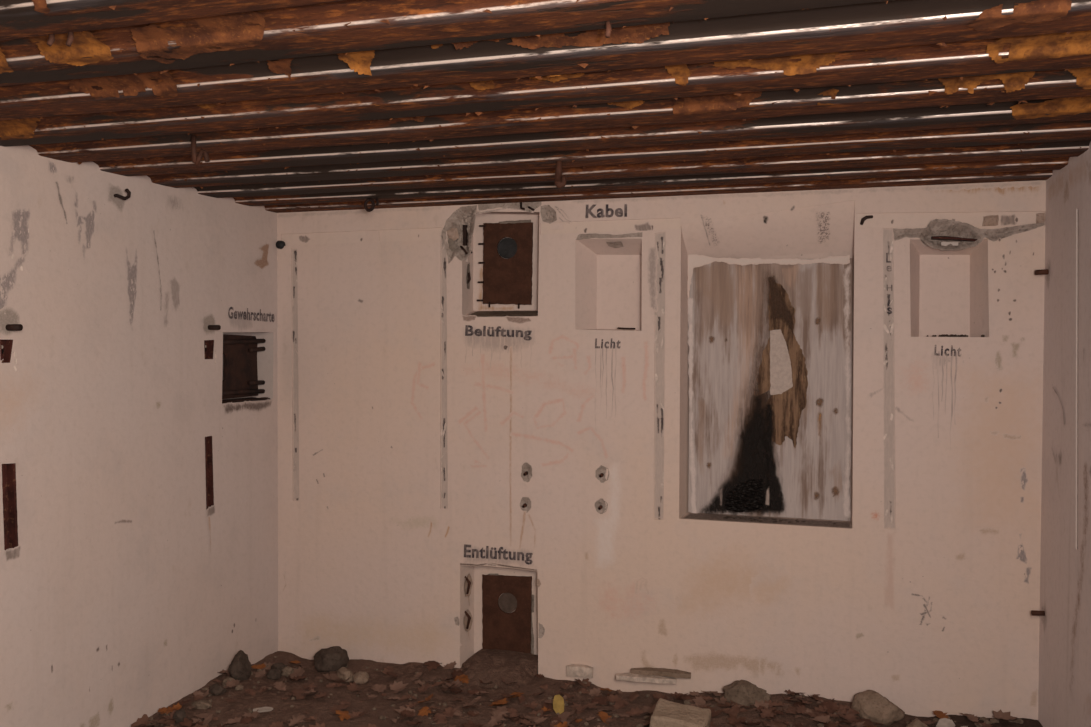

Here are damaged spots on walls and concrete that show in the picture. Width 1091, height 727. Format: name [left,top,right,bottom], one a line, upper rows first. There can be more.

rust [29,11,265,98]
rust [337,50,375,76]
rust [938,0,1091,120]
peeling [0,208,31,309]
spalling [890,219,1045,262]